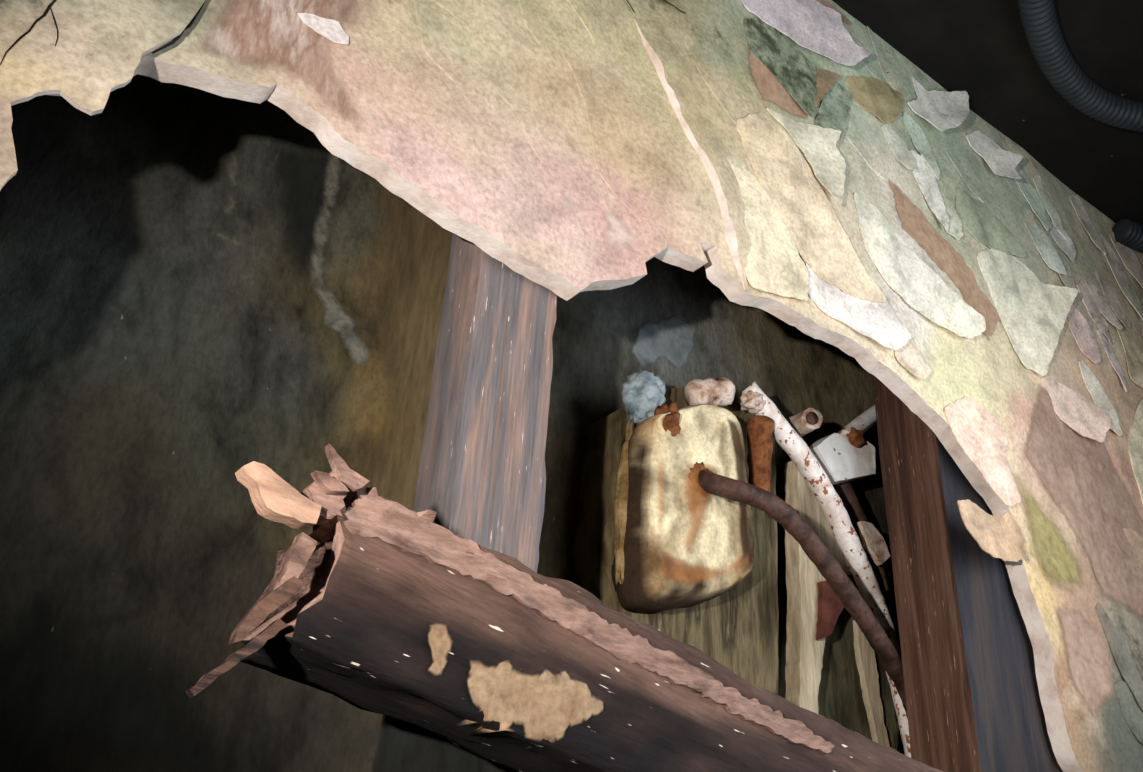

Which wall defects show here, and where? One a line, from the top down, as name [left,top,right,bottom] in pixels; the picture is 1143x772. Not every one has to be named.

crack [0,0,58,65]
crack [151,0,206,54]
leakage [281,151,368,364]
peeling [721,0,1143,744]
corrosion [728,419,745,482]
corrosion [662,465,749,584]
corrosion [857,521,891,566]
peeling [428,624,451,674]
peeling [466,661,603,742]